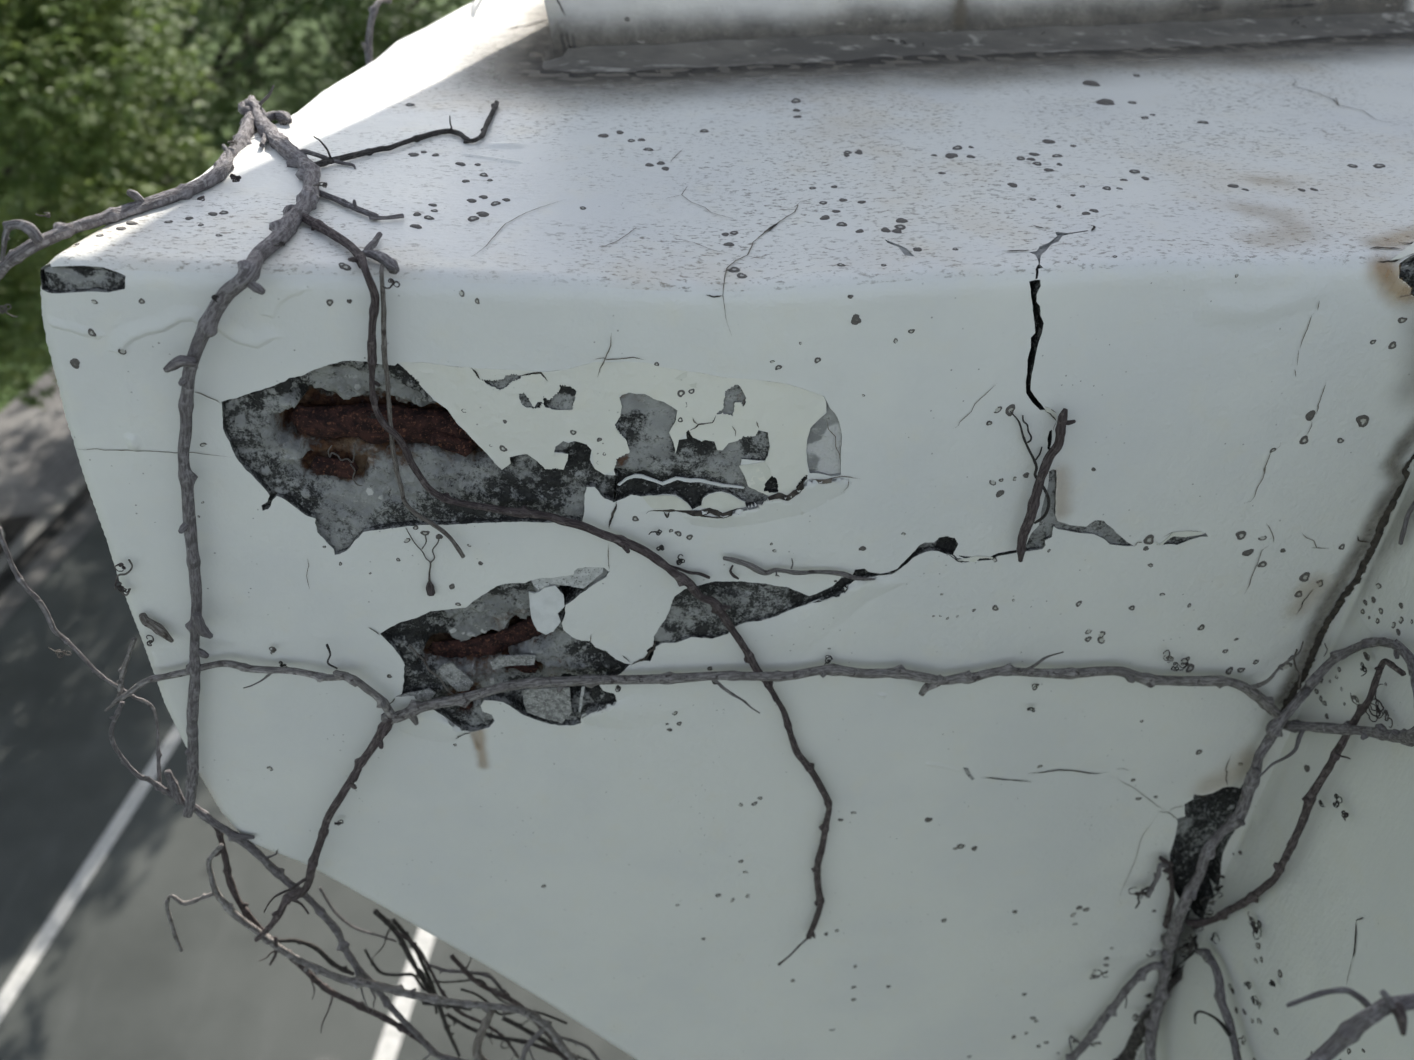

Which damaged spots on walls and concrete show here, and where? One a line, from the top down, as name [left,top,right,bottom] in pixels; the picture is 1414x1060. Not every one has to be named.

spalling [40,263,126,293]
crack [955,225,1057,450]
spalling [222,361,842,555]
spalling [380,469,1133,732]
spalling [1170,772,1247,937]